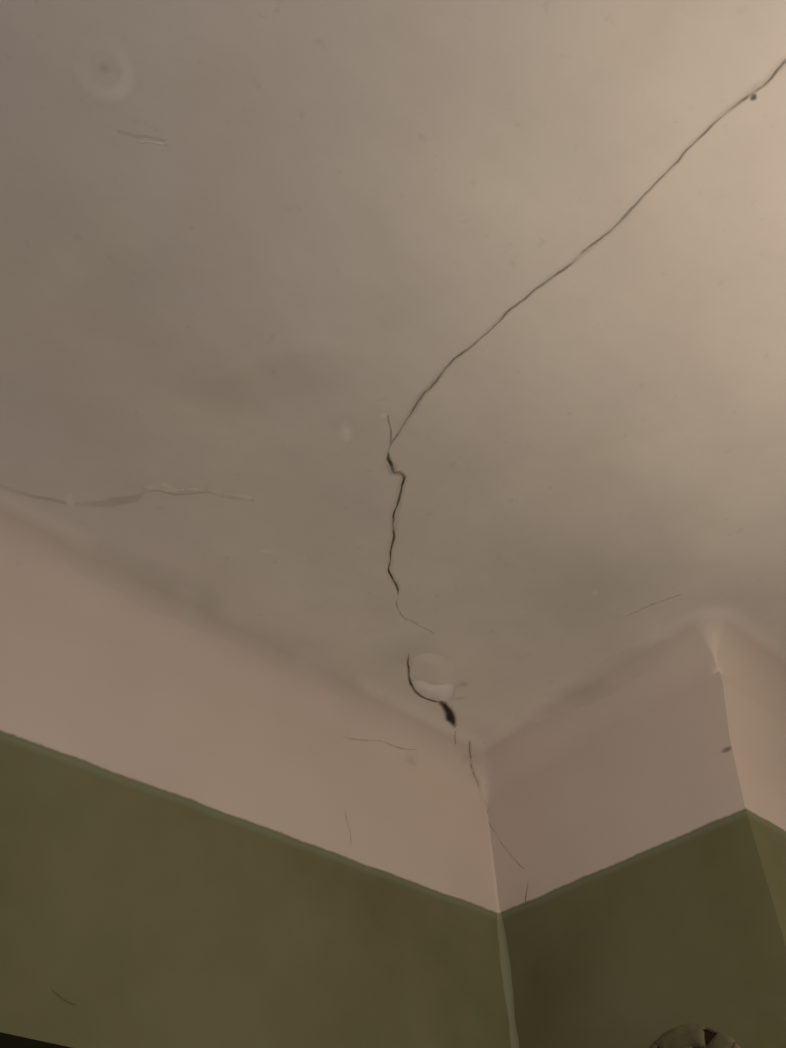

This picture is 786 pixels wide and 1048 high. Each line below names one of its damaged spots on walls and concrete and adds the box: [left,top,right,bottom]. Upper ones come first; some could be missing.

crack [383,54,786,596]
crack [446,740,490,819]